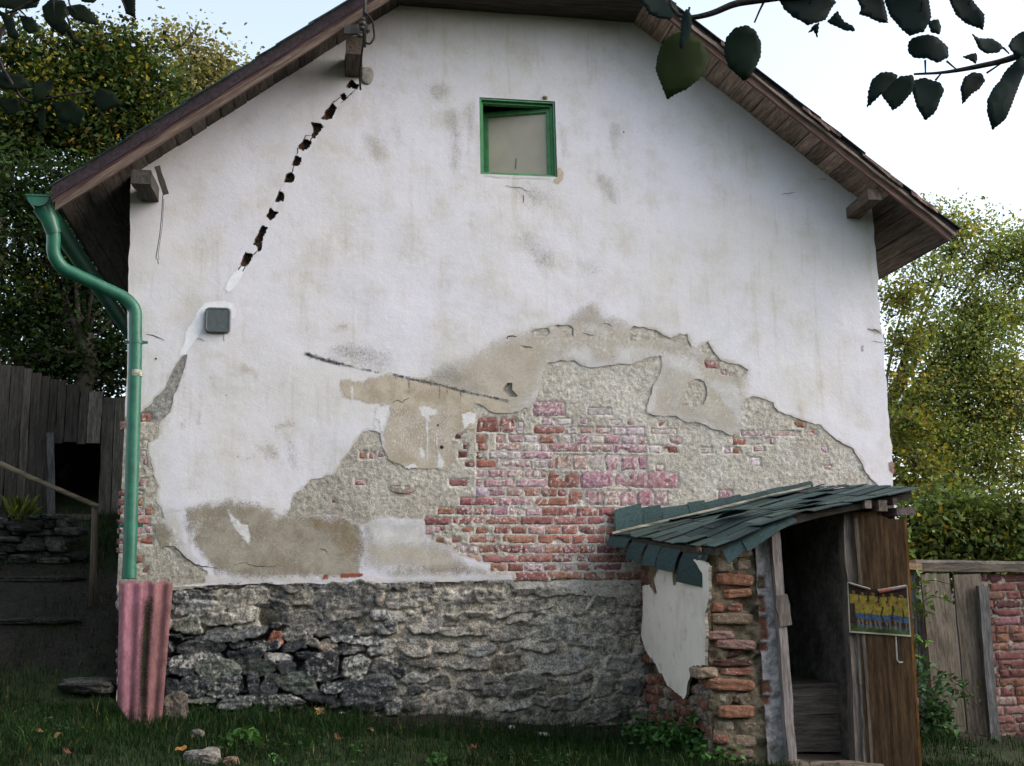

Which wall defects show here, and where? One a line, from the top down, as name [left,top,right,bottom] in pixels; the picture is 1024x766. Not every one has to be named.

flaking render [116,308,877,601]